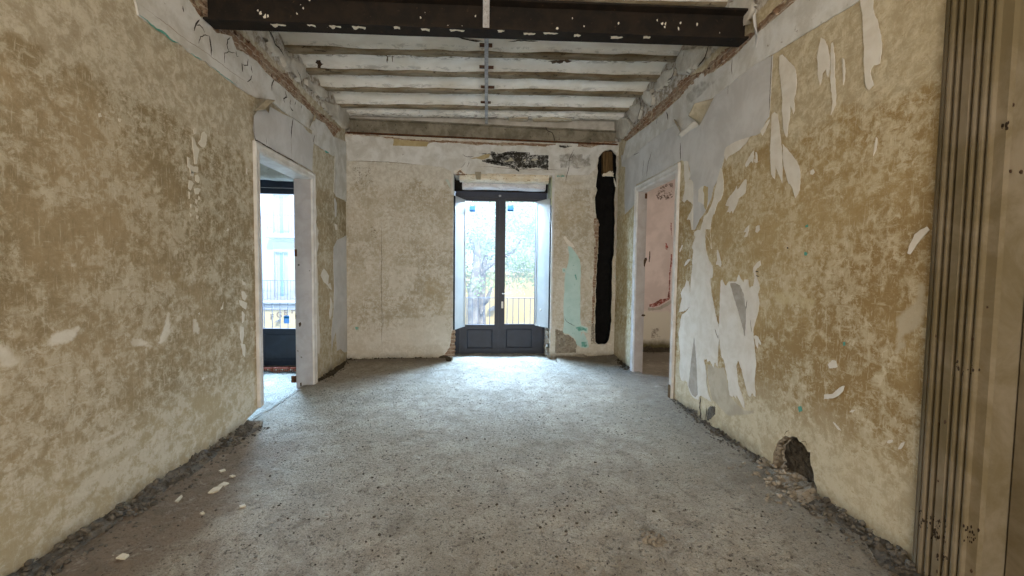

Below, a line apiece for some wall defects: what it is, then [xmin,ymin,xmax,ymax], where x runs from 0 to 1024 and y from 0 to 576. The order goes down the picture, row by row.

crack [136,1,302,111]
flaking render [189,0,556,175]
peeling [730,283,746,336]
flaking render [884,275,929,370]
flaking render [677,340,756,421]
spalling [771,431,816,486]